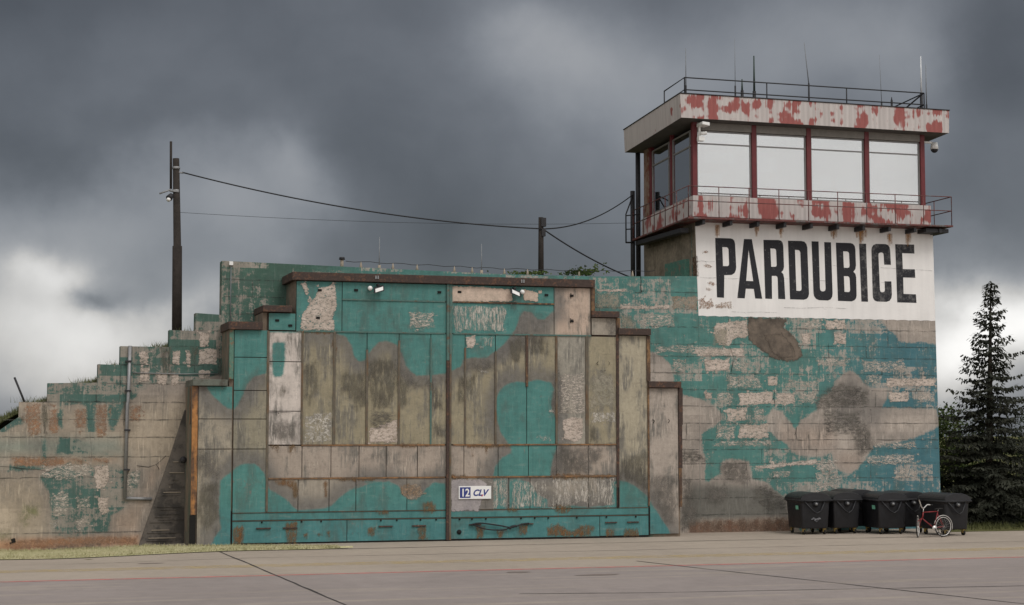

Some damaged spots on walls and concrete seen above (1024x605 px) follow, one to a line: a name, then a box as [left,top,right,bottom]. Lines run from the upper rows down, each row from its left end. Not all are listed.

peeling [137,330,218,386]
peeling [300,281,337,330]
peeling [453,286,542,348]
peeling [597,282,732,328]
peeling [654,318,816,446]
water stain [747,317,803,362]
peeling [800,319,849,367]
peeling [862,359,937,402]
spalling [6,457,136,550]
peeling [451,477,617,512]
peeling [756,459,839,492]
peeling [863,441,921,479]